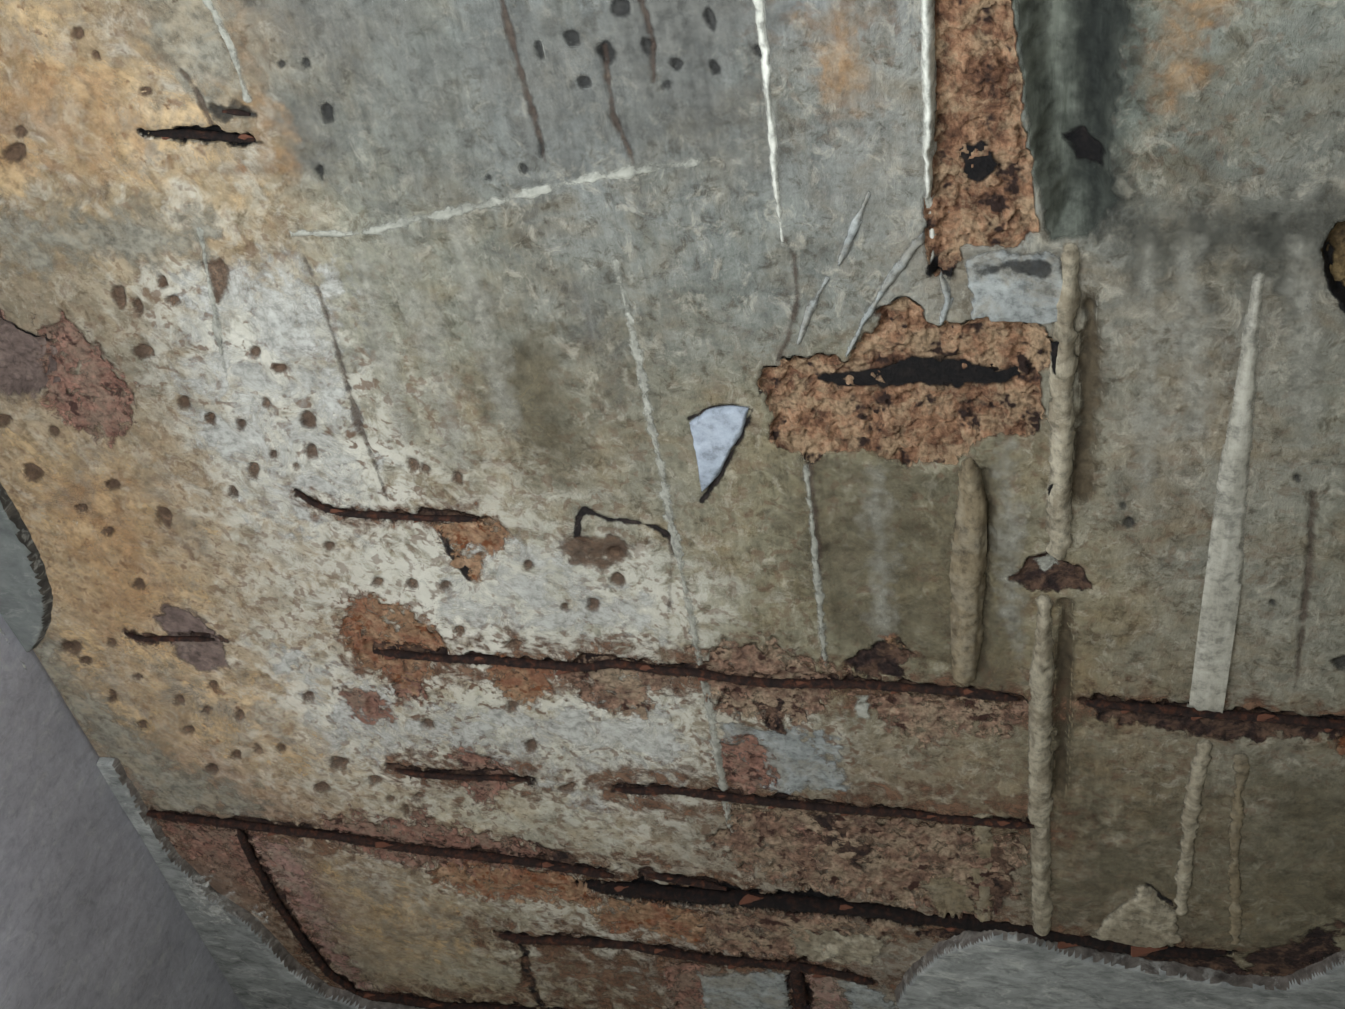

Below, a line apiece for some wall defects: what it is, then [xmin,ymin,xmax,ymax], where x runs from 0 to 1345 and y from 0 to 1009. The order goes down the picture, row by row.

crack [501,0,542,139]
crack [604,45,632,157]
spalling [757,0,1063,468]
peeling [689,406,749,492]
rust [1,425,328,777]
spalling [333,577,464,728]
crack [573,507,673,553]
rust [333,621,1032,729]
peeling [96,757,426,1009]
rust [144,799,1243,1009]
rust [581,761,1034,860]
peeling [301,632,1345,1009]